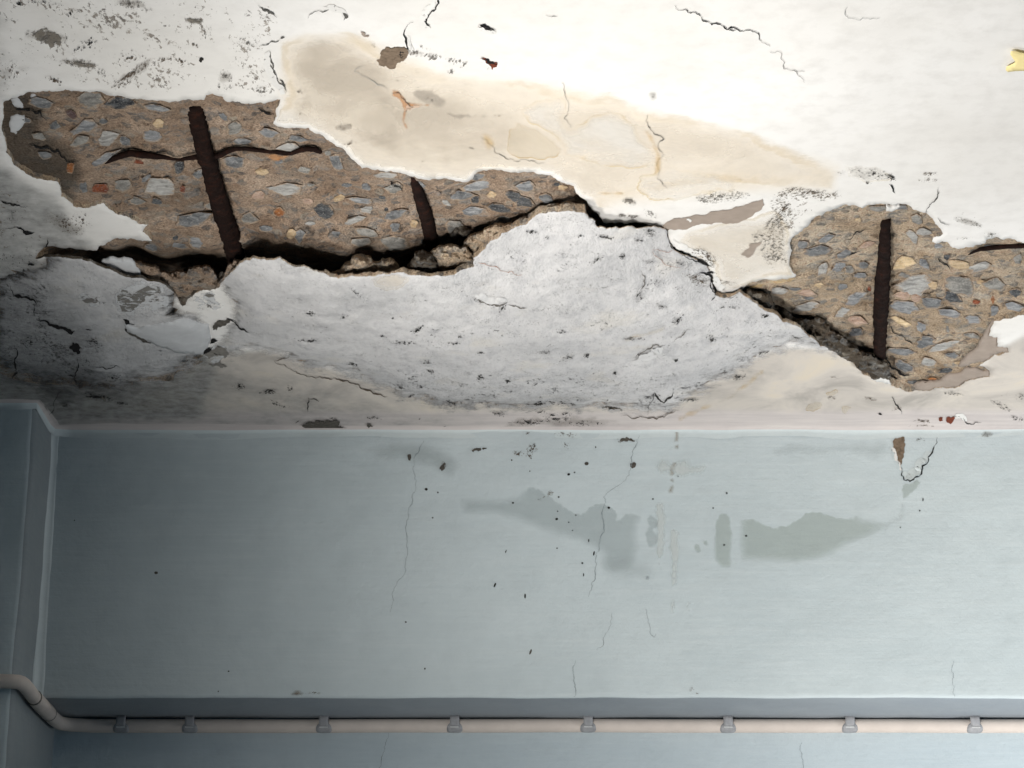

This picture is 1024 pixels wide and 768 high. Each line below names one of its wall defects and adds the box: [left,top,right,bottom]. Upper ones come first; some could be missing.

crack [675,6,804,81]
damp [409,95,482,134]
damp [325,125,547,178]
spalling [2,28,764,330]
crack [641,239,733,301]
crack [10,287,89,335]
peeling [205,346,229,368]
crack [203,319,247,355]
spalling [742,204,1024,391]
peeling [891,437,907,470]
crack [901,439,937,482]
crack [588,392,679,597]